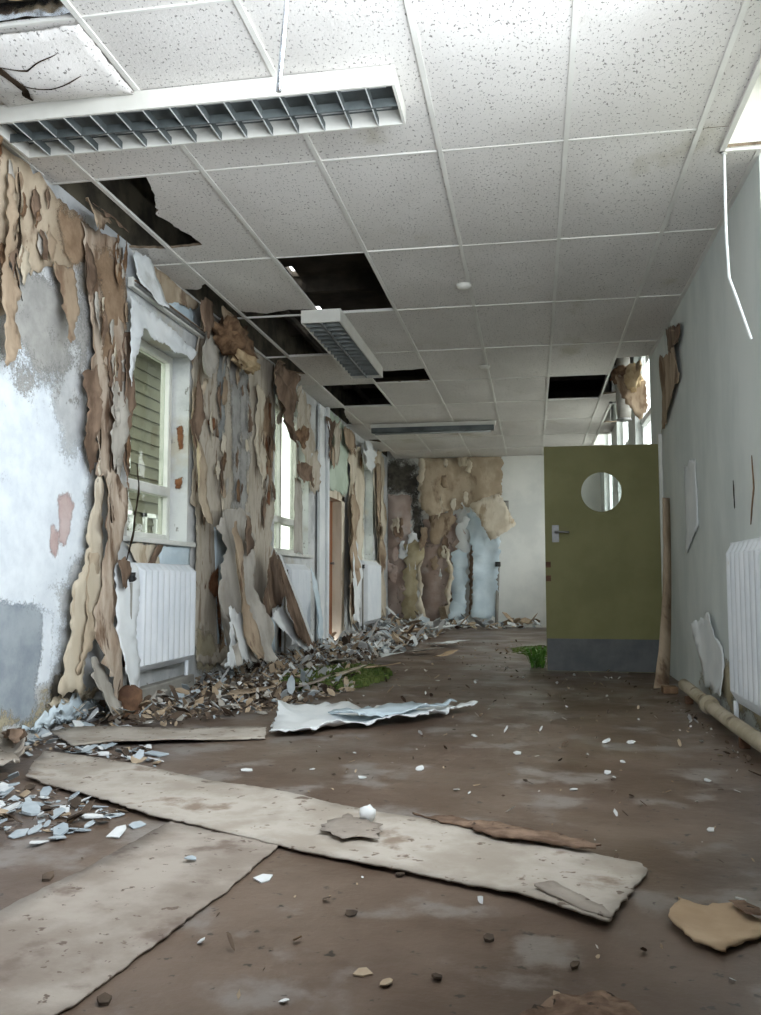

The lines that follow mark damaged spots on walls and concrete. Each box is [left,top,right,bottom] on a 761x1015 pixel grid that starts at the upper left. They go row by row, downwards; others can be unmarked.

crack [0,68,34,101]
peeling [0,159,58,286]
peeling [209,366,276,511]
peeling [326,411,362,496]
peeling [50,492,74,558]
peeling [262,482,276,530]
peeling [388,457,501,621]